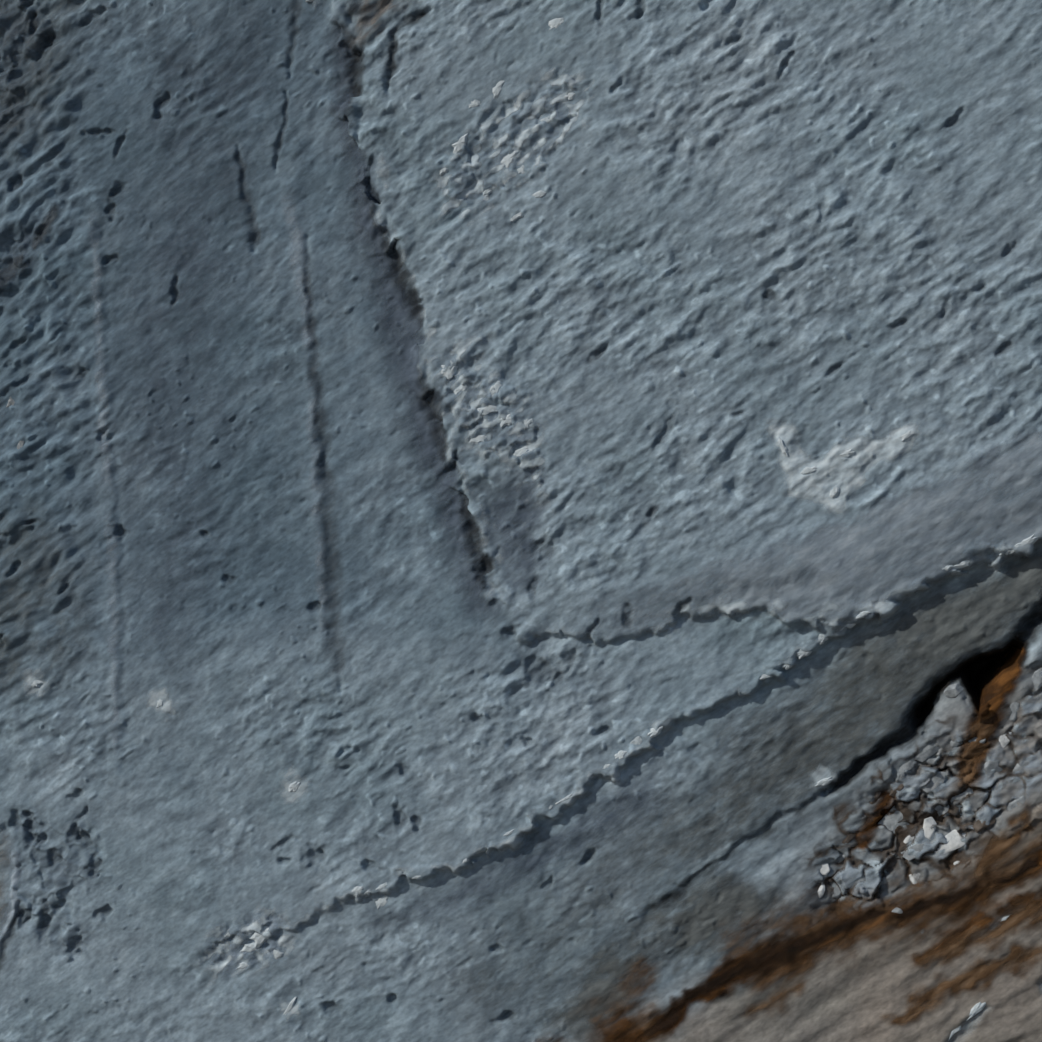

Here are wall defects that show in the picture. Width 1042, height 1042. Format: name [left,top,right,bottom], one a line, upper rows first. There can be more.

peeling [346,0,394,40]
spalling [427,337,544,495]
crack [661,877,693,906]
rust [595,809,1042,1042]
rust [856,792,893,849]
spalling [809,667,1042,918]
crack [832,602,1042,789]
rust [958,644,1026,785]